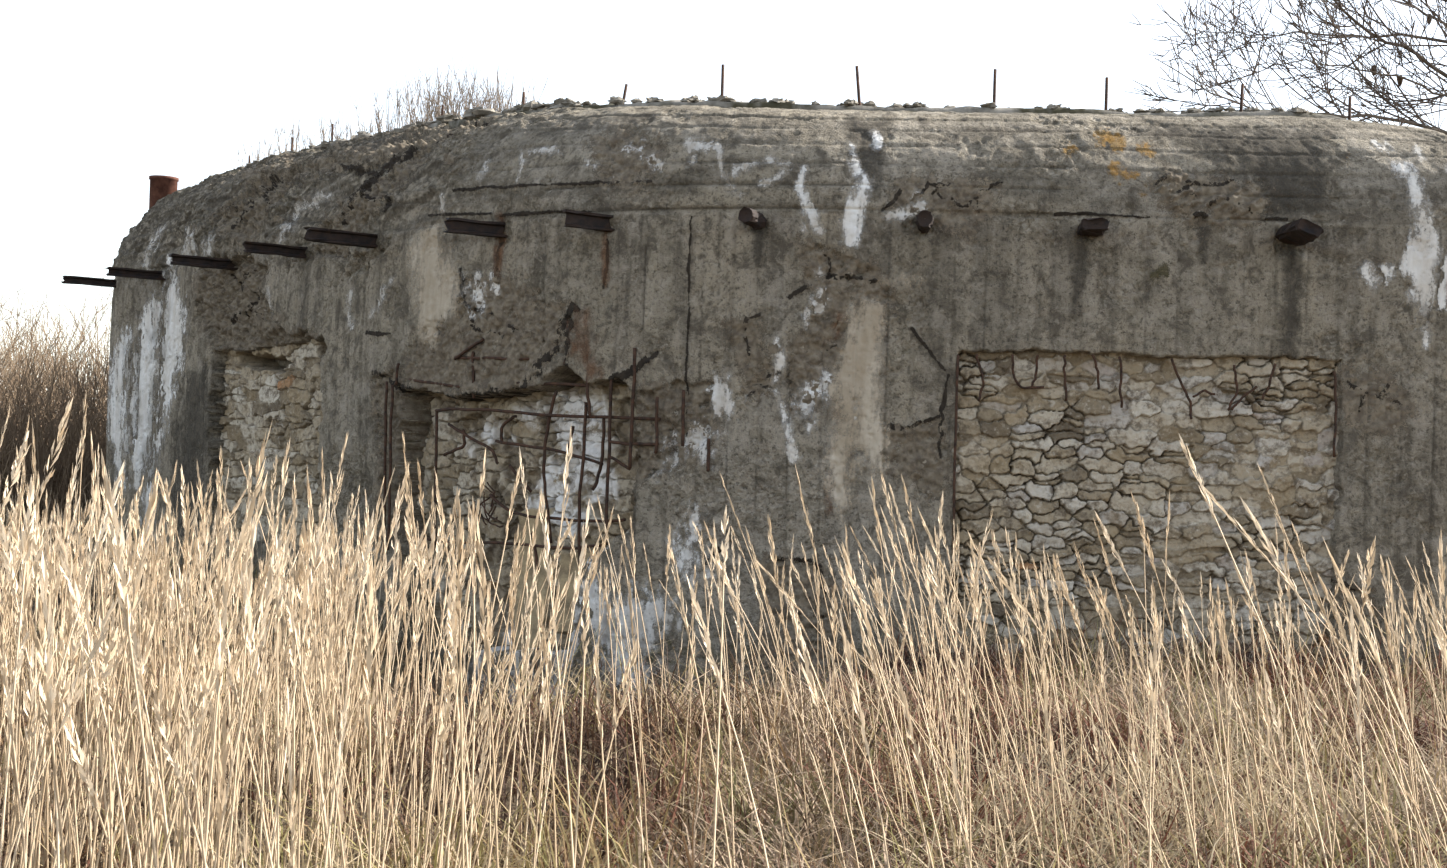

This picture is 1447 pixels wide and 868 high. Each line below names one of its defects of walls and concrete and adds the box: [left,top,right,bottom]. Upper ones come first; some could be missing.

water stain [684,137,824,235]
water stain [842,112,890,247]
water stain [882,191,929,221]
crack [881,181,1003,213]
efflorescence [1361,140,1447,349]
water stain [106,227,225,546]
spalling [363,231,902,575]
water stain [668,500,715,590]
water stain [465,548,682,712]